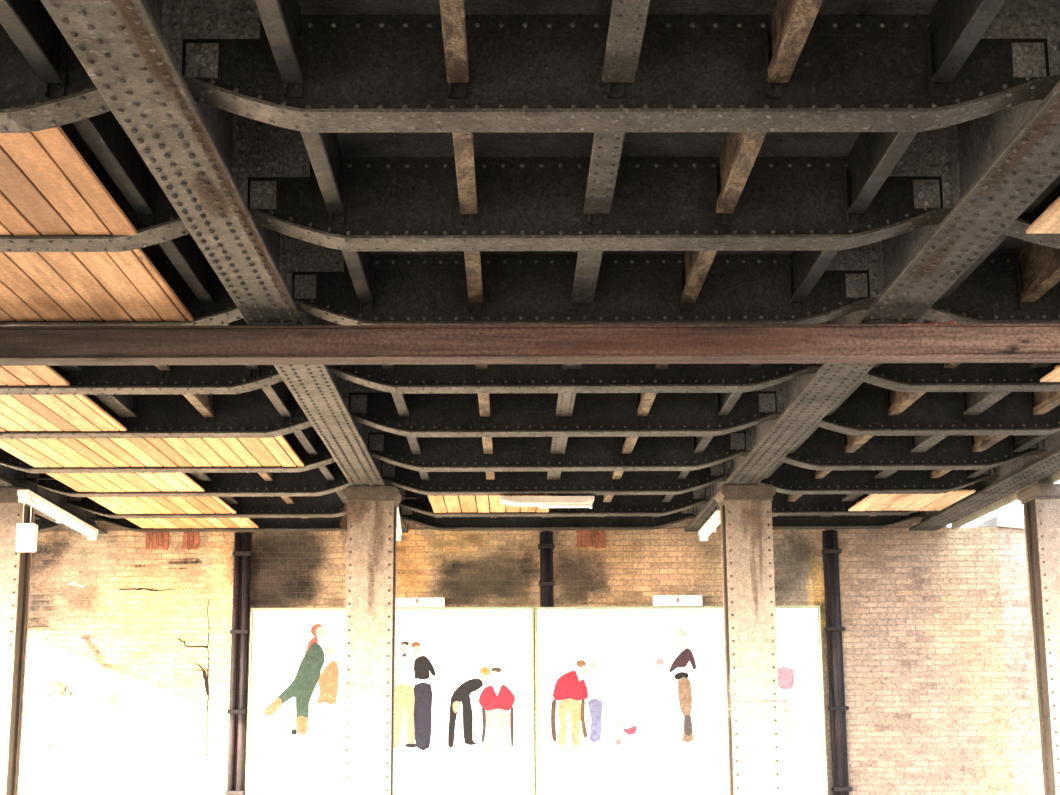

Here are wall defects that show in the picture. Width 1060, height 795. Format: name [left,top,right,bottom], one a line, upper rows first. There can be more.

damp [36,535,115,572]
damp [168,557,213,570]
damp [440,552,537,599]
crack [178,598,210,795]